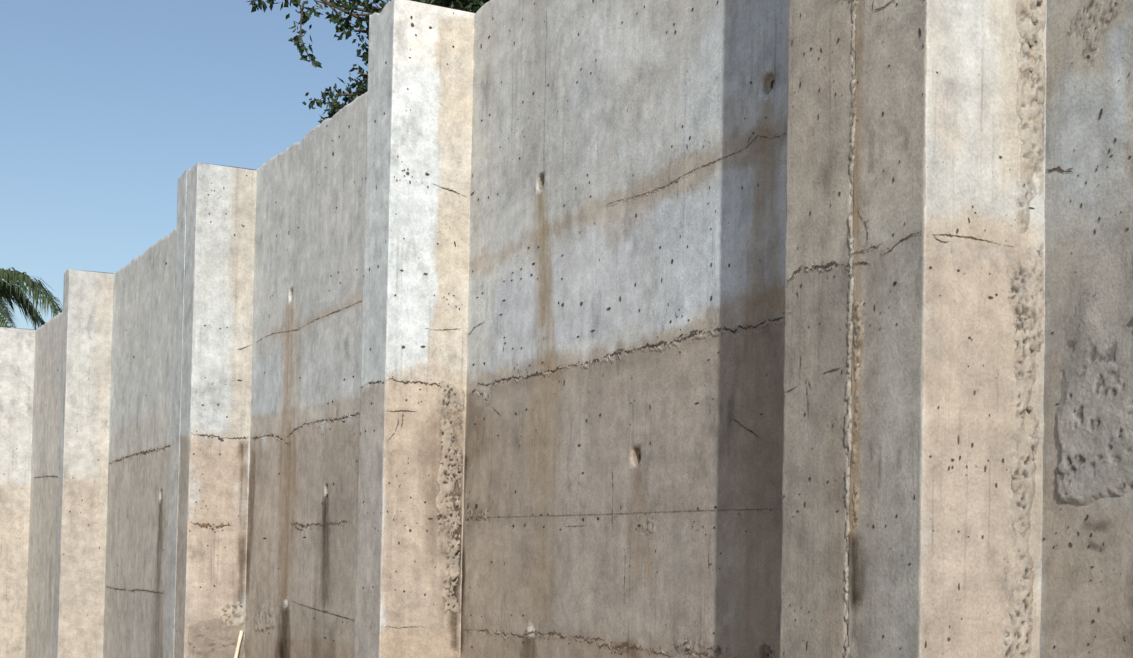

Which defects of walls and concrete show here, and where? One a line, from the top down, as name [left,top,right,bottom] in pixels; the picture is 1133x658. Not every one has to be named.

crack [606,133,787,207]
crack [786,211,1014,282]
crack [237,300,362,350]
crack [110,312,785,464]
crack [463,628,736,658]